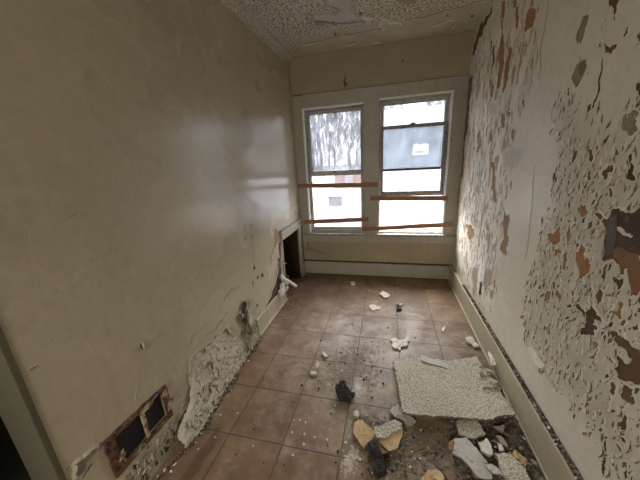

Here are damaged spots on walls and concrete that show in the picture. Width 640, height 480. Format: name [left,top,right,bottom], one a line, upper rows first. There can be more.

spalling [575,13,590,46]
spalling [608,0,621,22]
spalling [598,25,631,57]
crack [585,58,603,121]
peeling [452,0,542,313]
peeling [520,54,640,480]
spalling [177,299,260,448]
spalling [479,366,507,404]